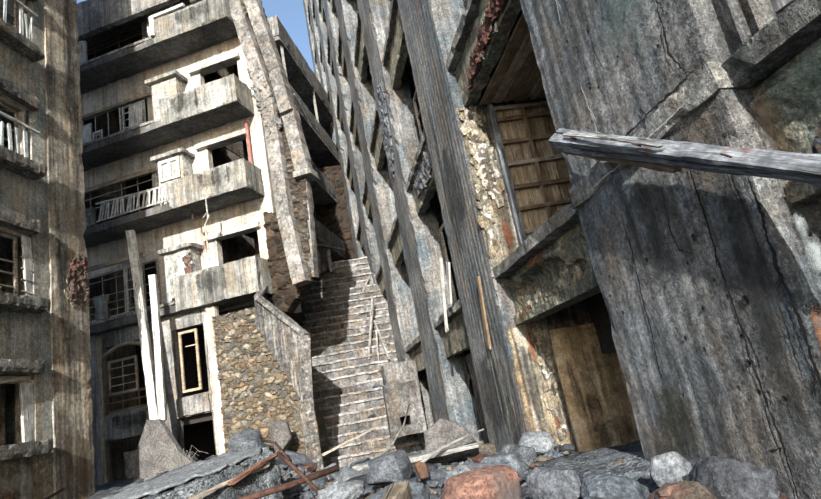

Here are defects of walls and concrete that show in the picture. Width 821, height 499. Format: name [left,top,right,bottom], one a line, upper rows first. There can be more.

peeling [458,105,504,258]
spalling [466,0,508,90]
crack [625,0,704,138]
spalling [811,119,821,154]
spalling [63,252,90,308]
crack [689,169,799,499]
crack [732,176,821,397]